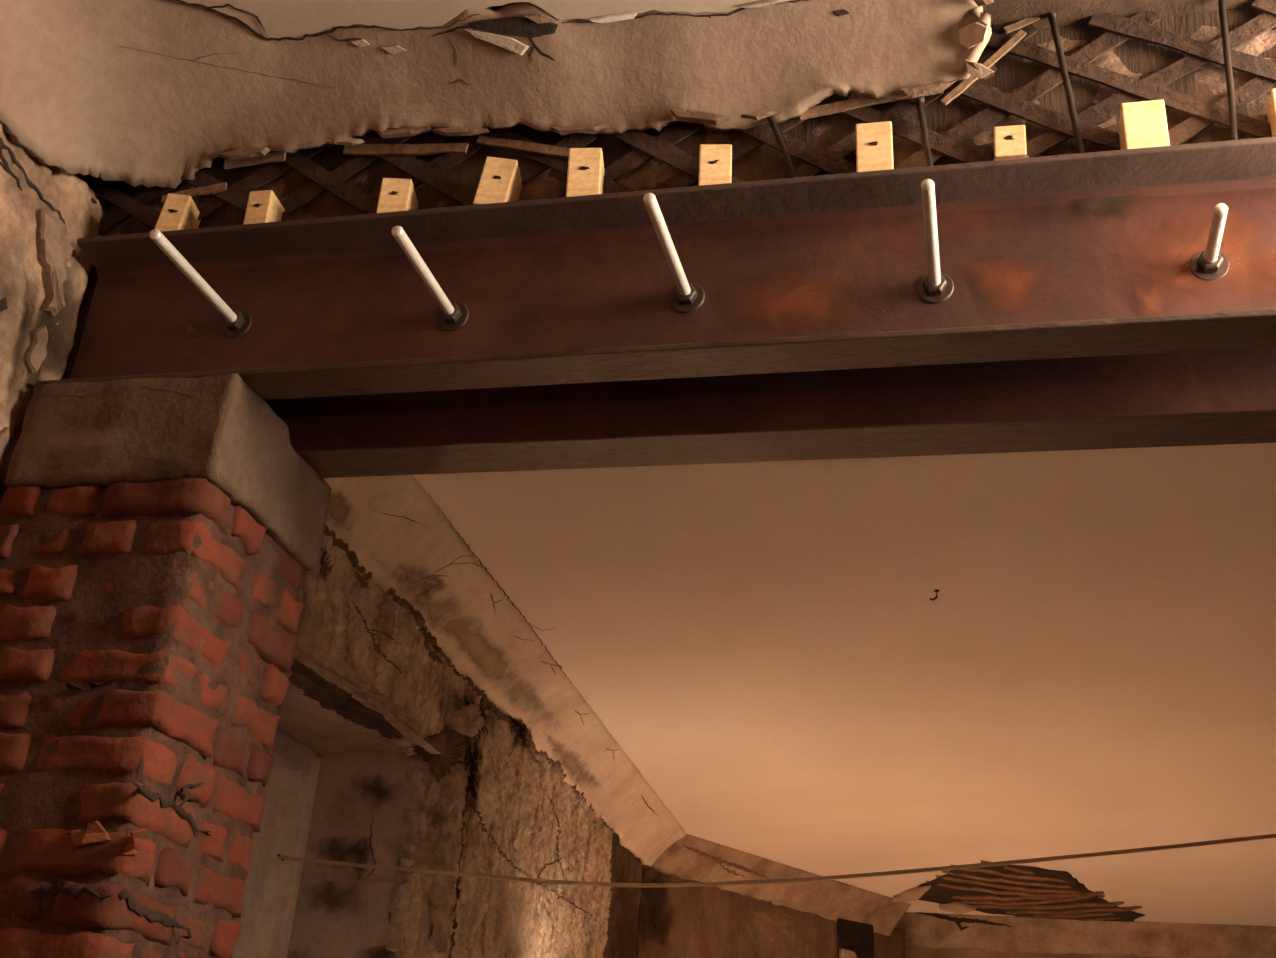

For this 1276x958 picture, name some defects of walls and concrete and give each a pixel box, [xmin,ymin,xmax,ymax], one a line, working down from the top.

crack [119,0,479,88]
flaking render [432,15,558,63]
flaking render [589,12,638,23]
crack [633,8,746,19]
flaking render [900,22,994,98]
damp [406,571,539,747]
crack [380,493,620,762]
damp [452,694,496,808]
damp [554,745,594,782]
spalling [70,821,111,848]
crack [447,676,613,958]
flaking render [890,860,1146,922]